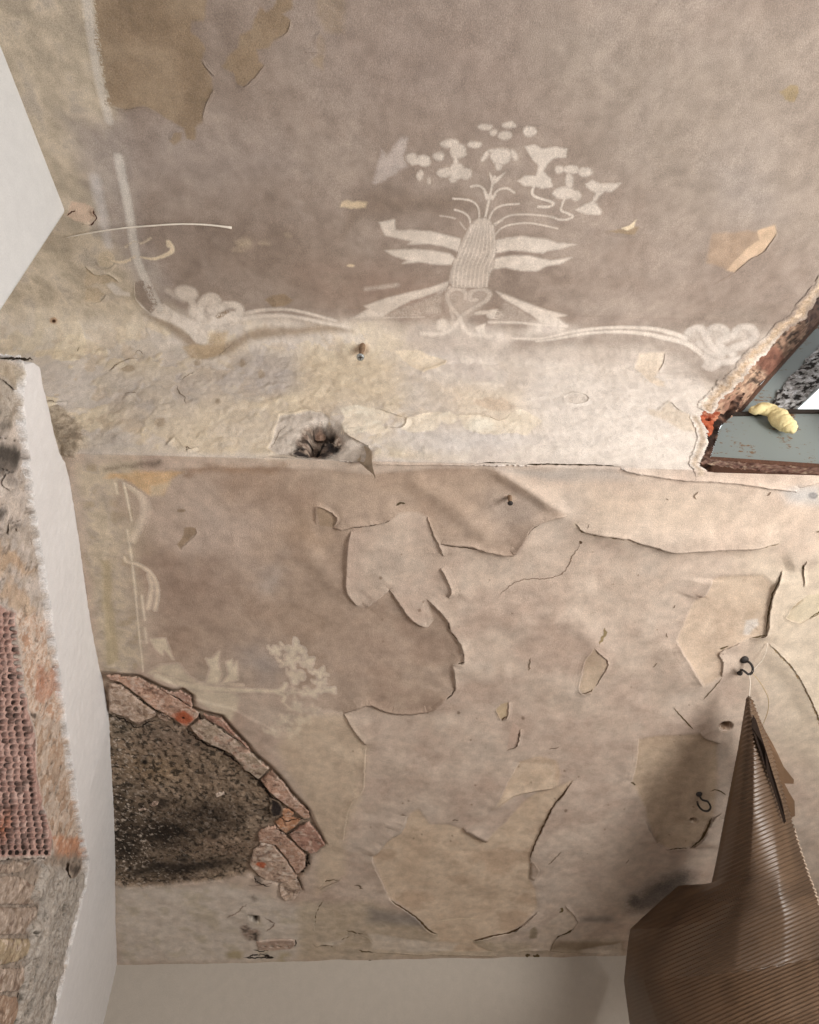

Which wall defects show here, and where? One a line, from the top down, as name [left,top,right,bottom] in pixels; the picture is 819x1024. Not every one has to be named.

peeling [703,223,780,284]
flaking render [632,277,819,478]
peeling [100,395,583,962]
peeling [575,628,613,698]
peeling [671,561,819,699]
peeling [627,709,725,854]